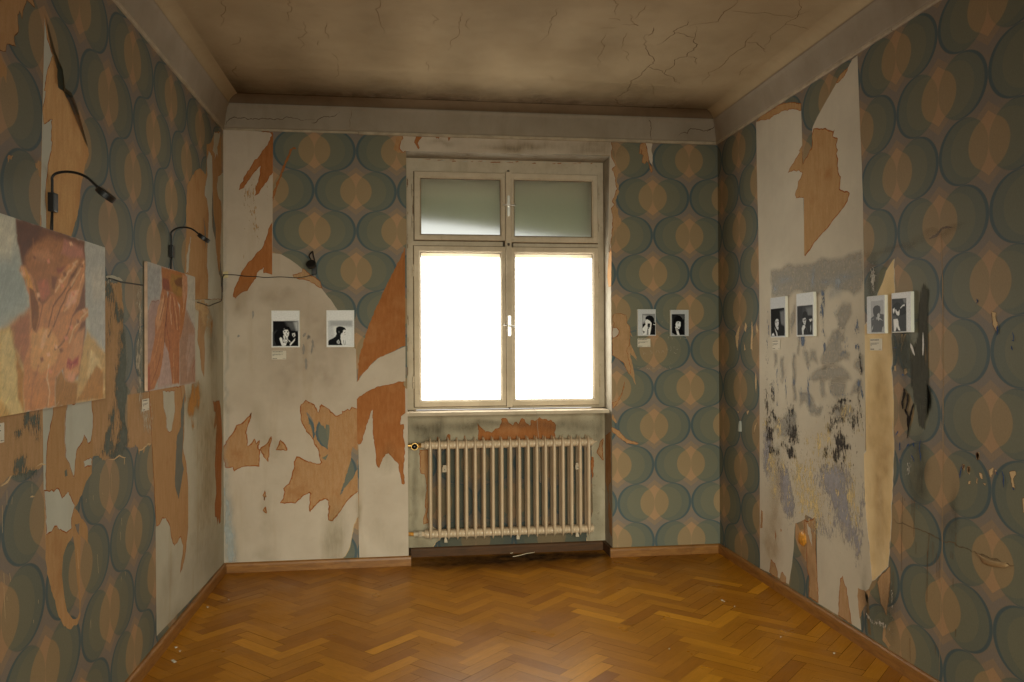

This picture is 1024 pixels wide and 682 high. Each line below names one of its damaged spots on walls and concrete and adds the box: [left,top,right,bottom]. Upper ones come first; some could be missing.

crack [597,0,808,137]
peeling [239,131,273,195]
peeling [788,128,850,256]
peeling [233,223,272,298]
peeling [224,367,408,521]